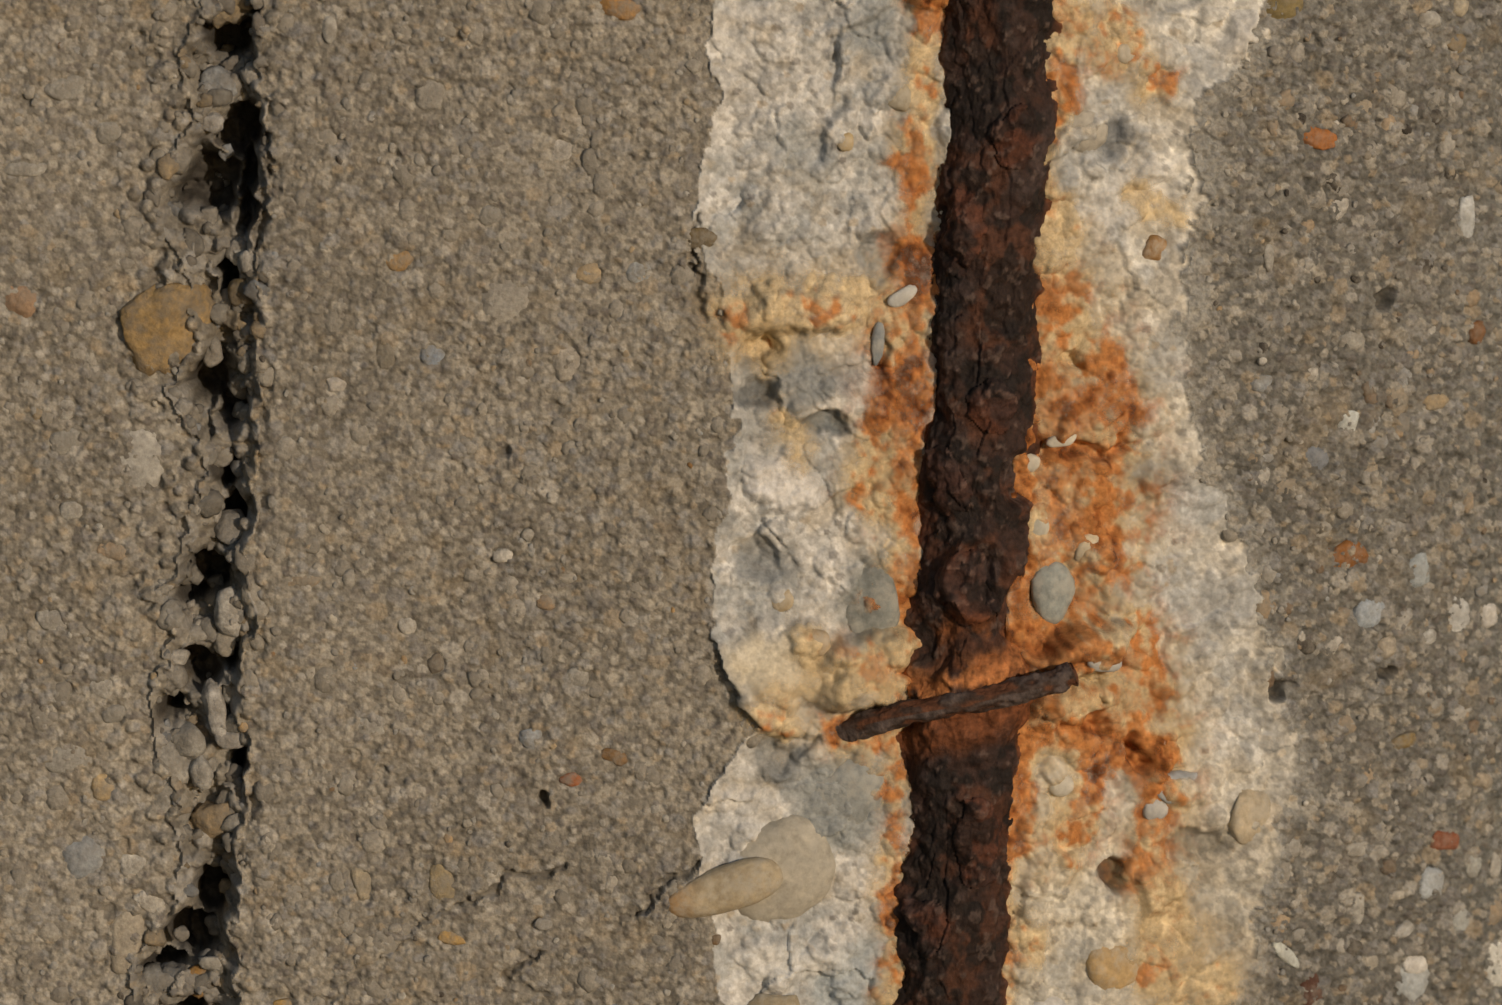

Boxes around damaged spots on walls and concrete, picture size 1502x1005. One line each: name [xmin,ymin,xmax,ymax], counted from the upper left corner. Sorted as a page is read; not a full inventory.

crack [119,0,283,1005]
spalling [669,0,951,1005]
spalling [1002,0,1305,1005]